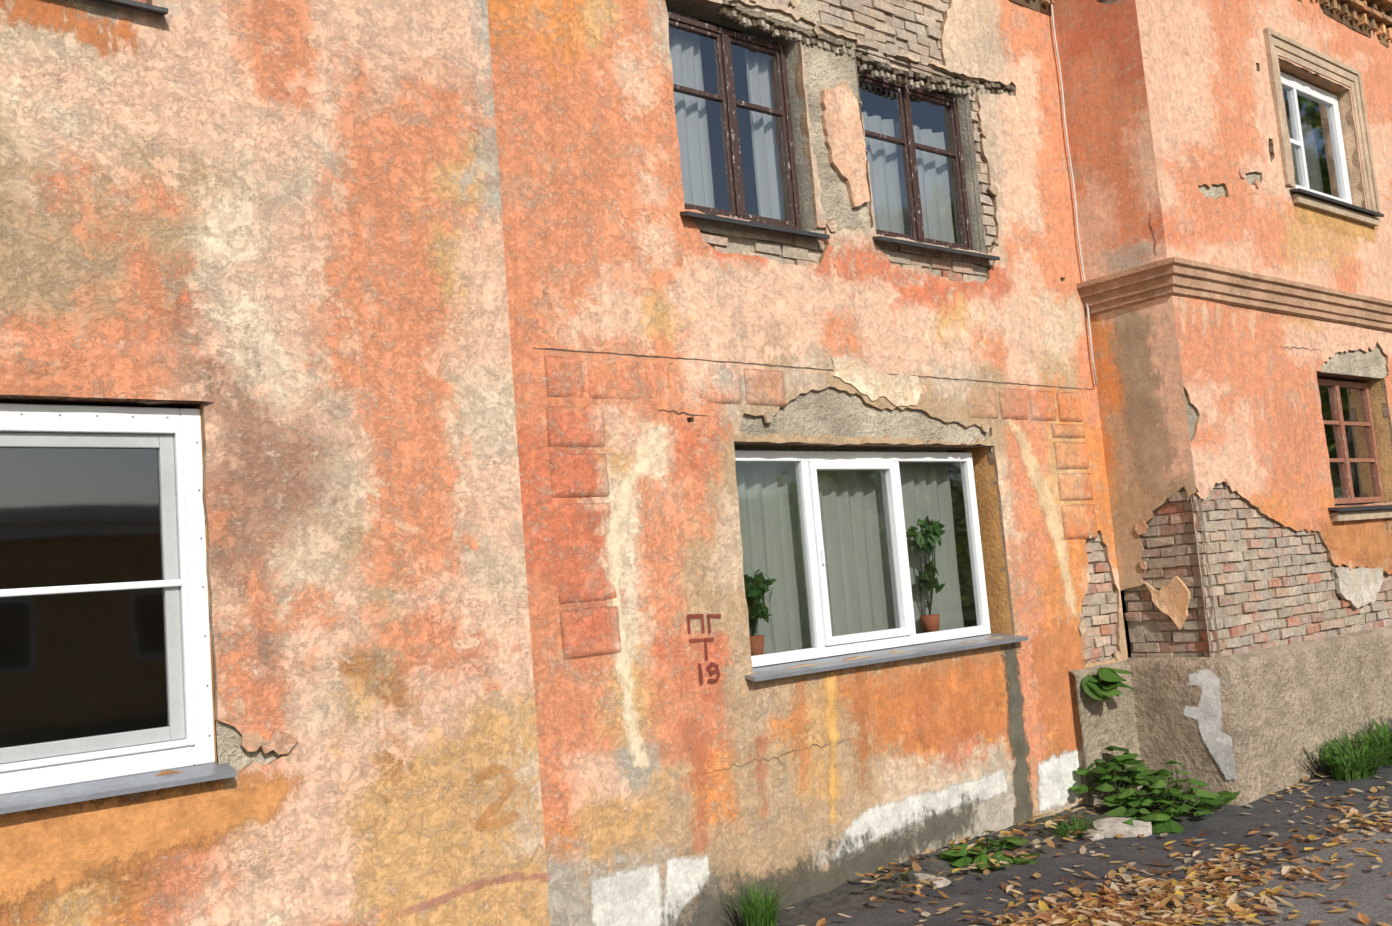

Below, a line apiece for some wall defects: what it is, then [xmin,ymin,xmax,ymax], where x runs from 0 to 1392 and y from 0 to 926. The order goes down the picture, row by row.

flaking render [692,0,1000,283]
flaking render [740,357,992,451]
flaking render [1078,478,1392,781]
flaking render [216,720,298,772]
damp [0,770,303,906]